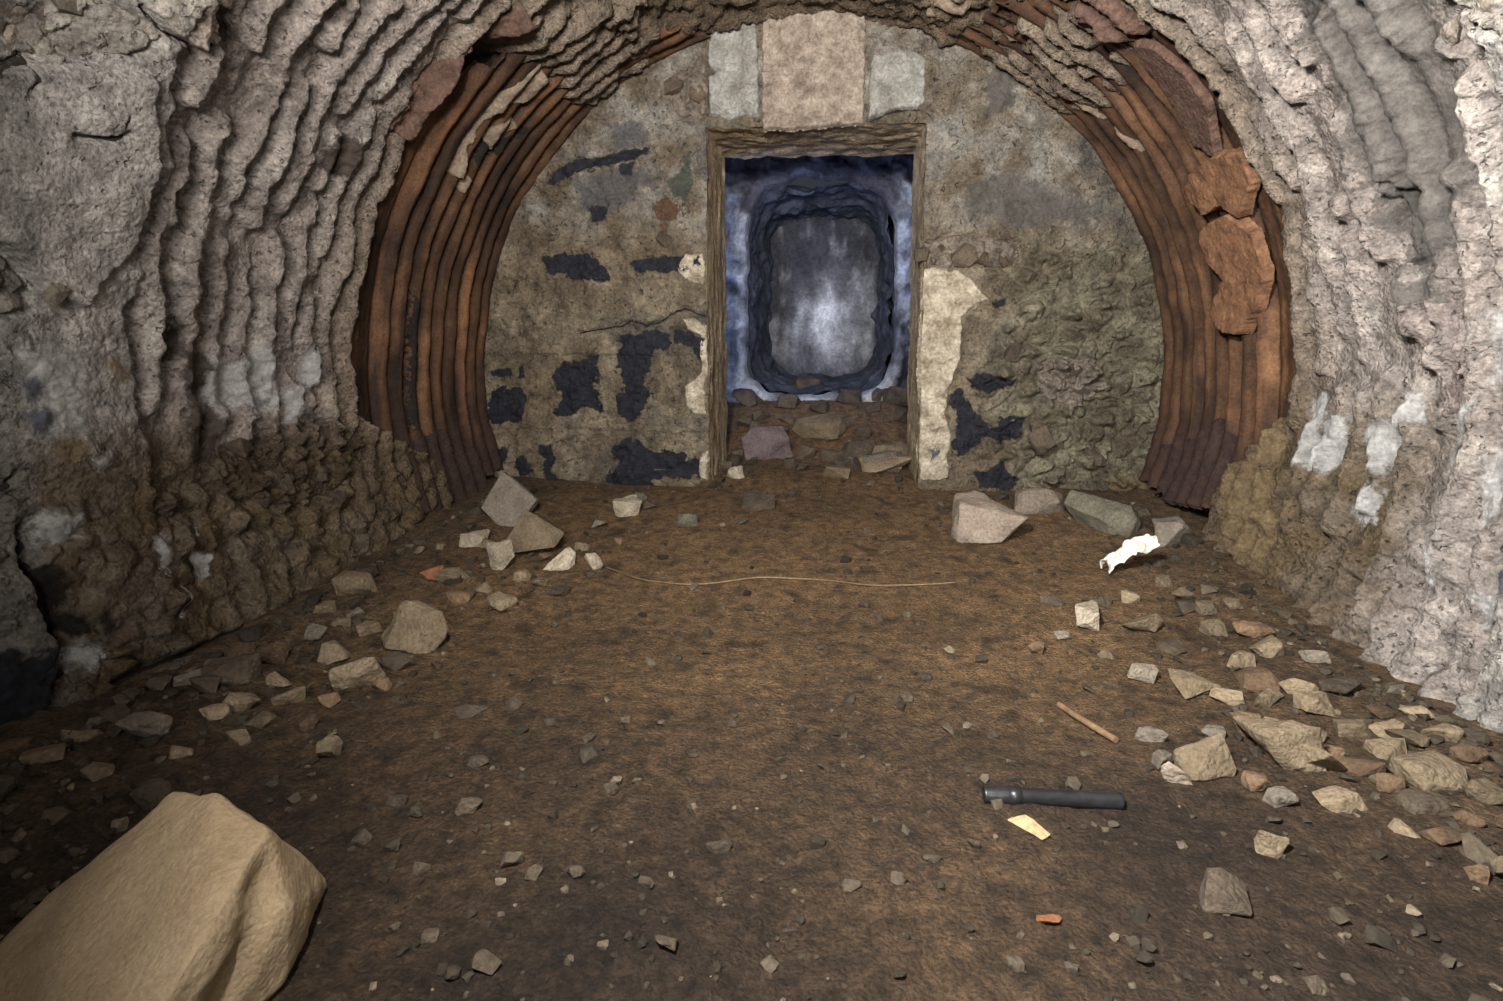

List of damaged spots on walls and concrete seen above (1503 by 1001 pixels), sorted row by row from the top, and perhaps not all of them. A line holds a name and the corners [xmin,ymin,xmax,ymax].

corrosion [389,4,536,142]
corrosion [1184,147,1275,335]
flaking render [673,318,711,415]
flaking render [914,233,1019,481]
flaking render [699,451,710,480]
damp [1292,392,1348,473]
damp [1353,394,1426,525]